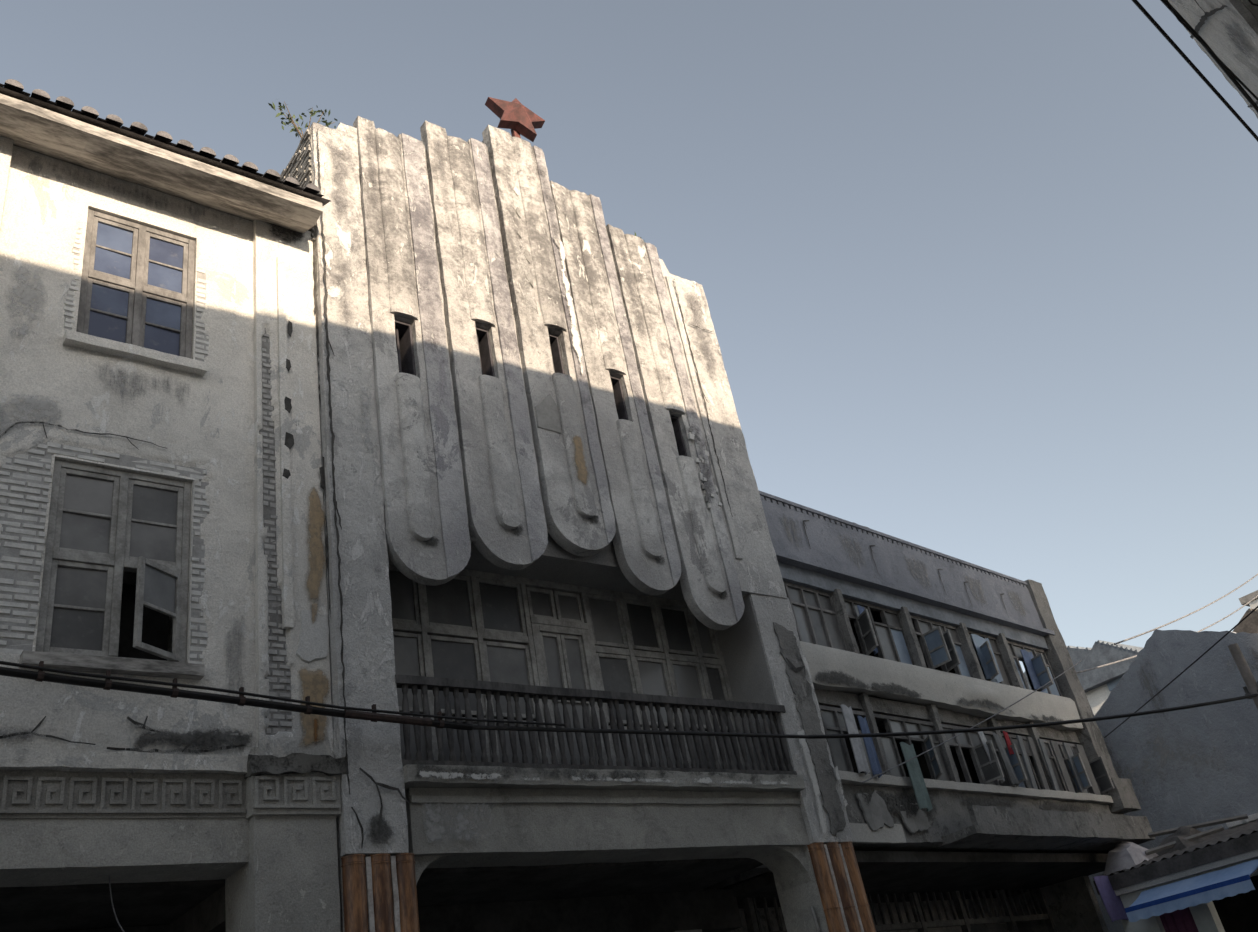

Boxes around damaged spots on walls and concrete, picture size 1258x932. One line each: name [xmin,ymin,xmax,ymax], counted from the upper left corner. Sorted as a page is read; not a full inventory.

crack [1190,0,1258,39]
flaking render [0,442,210,664]
flaking render [259,328,329,735]
crack [0,716,245,754]
spalling [773,622,931,836]